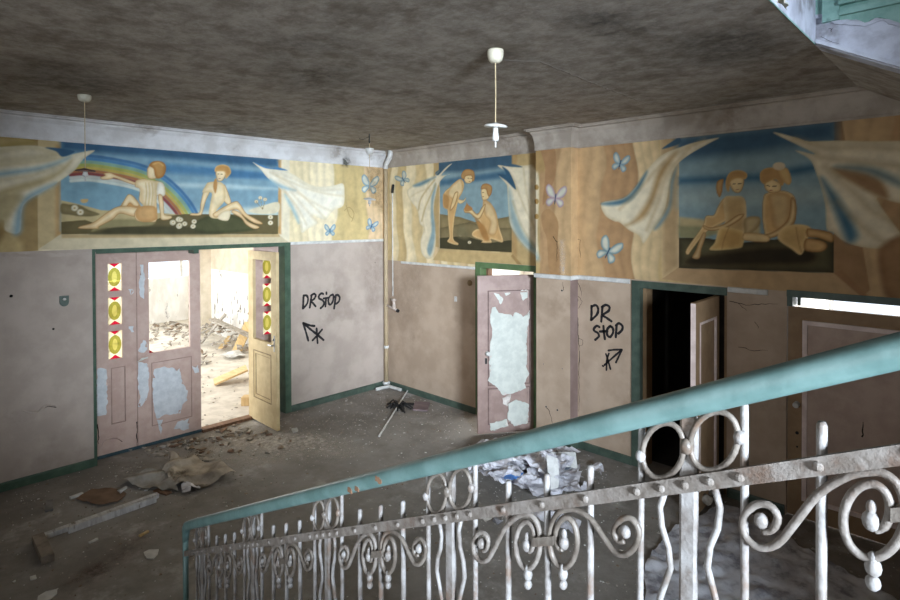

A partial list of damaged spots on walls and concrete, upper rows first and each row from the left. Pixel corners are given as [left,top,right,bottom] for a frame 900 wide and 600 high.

peeling [128,265,145,299]
peeling [97,368,108,416]
peeling [137,340,189,433]
peeling [488,290,530,431]